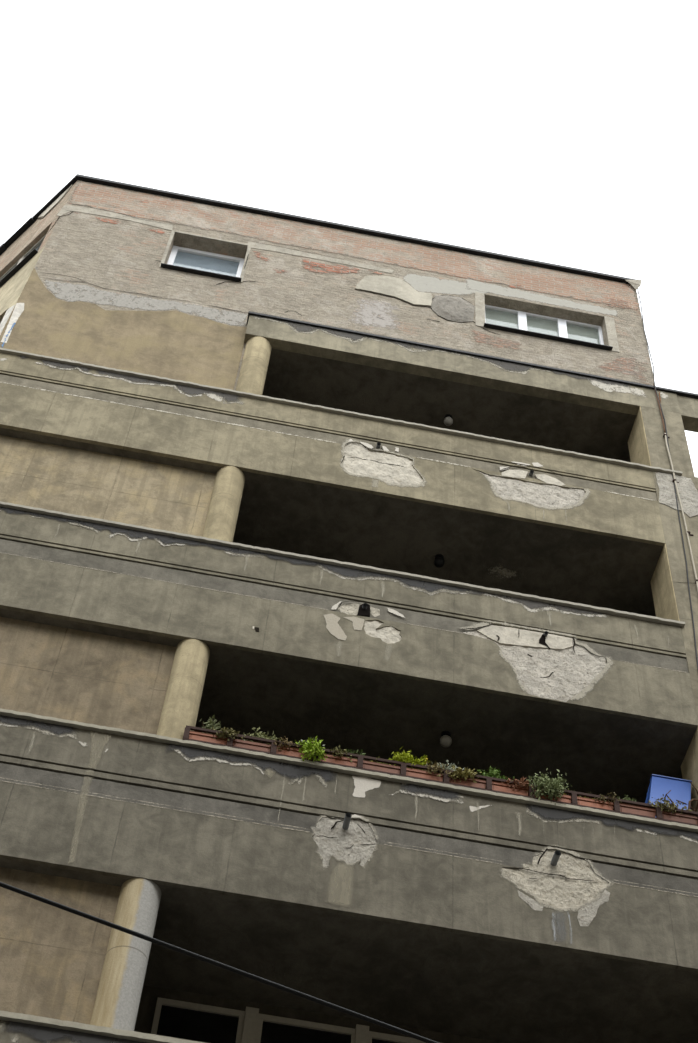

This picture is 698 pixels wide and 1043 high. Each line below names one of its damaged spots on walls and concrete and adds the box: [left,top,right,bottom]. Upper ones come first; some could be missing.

flaking render [45,181,639,328]
spalling [340,439,427,487]
spalling [479,461,590,511]
spalling [655,472,698,518]
flaking render [324,601,405,643]
spalling [460,620,613,702]
peeling [352,776,381,798]
spalling [311,814,378,905]
spalling [501,845,612,940]